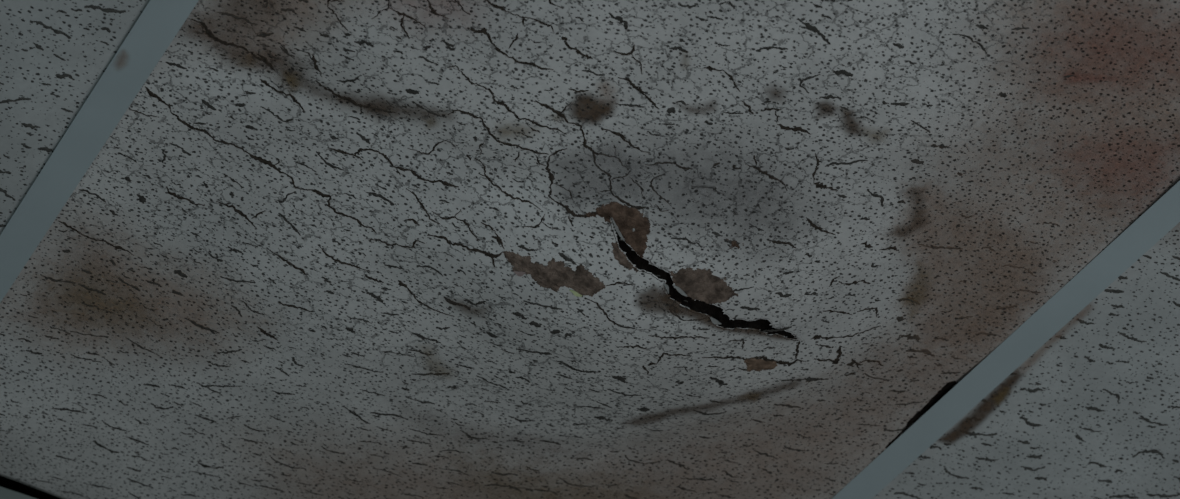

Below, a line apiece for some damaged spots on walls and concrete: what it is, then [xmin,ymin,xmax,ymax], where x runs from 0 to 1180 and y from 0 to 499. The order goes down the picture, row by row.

crack [953,24,1029,54]
crack [0,5,126,227]
water stain [336,98,434,116]
crack [114,146,151,203]
crack [130,0,963,499]
spalling [503,251,606,297]
spalling [669,268,739,304]
crack [0,221,363,499]
crack [876,246,1180,499]